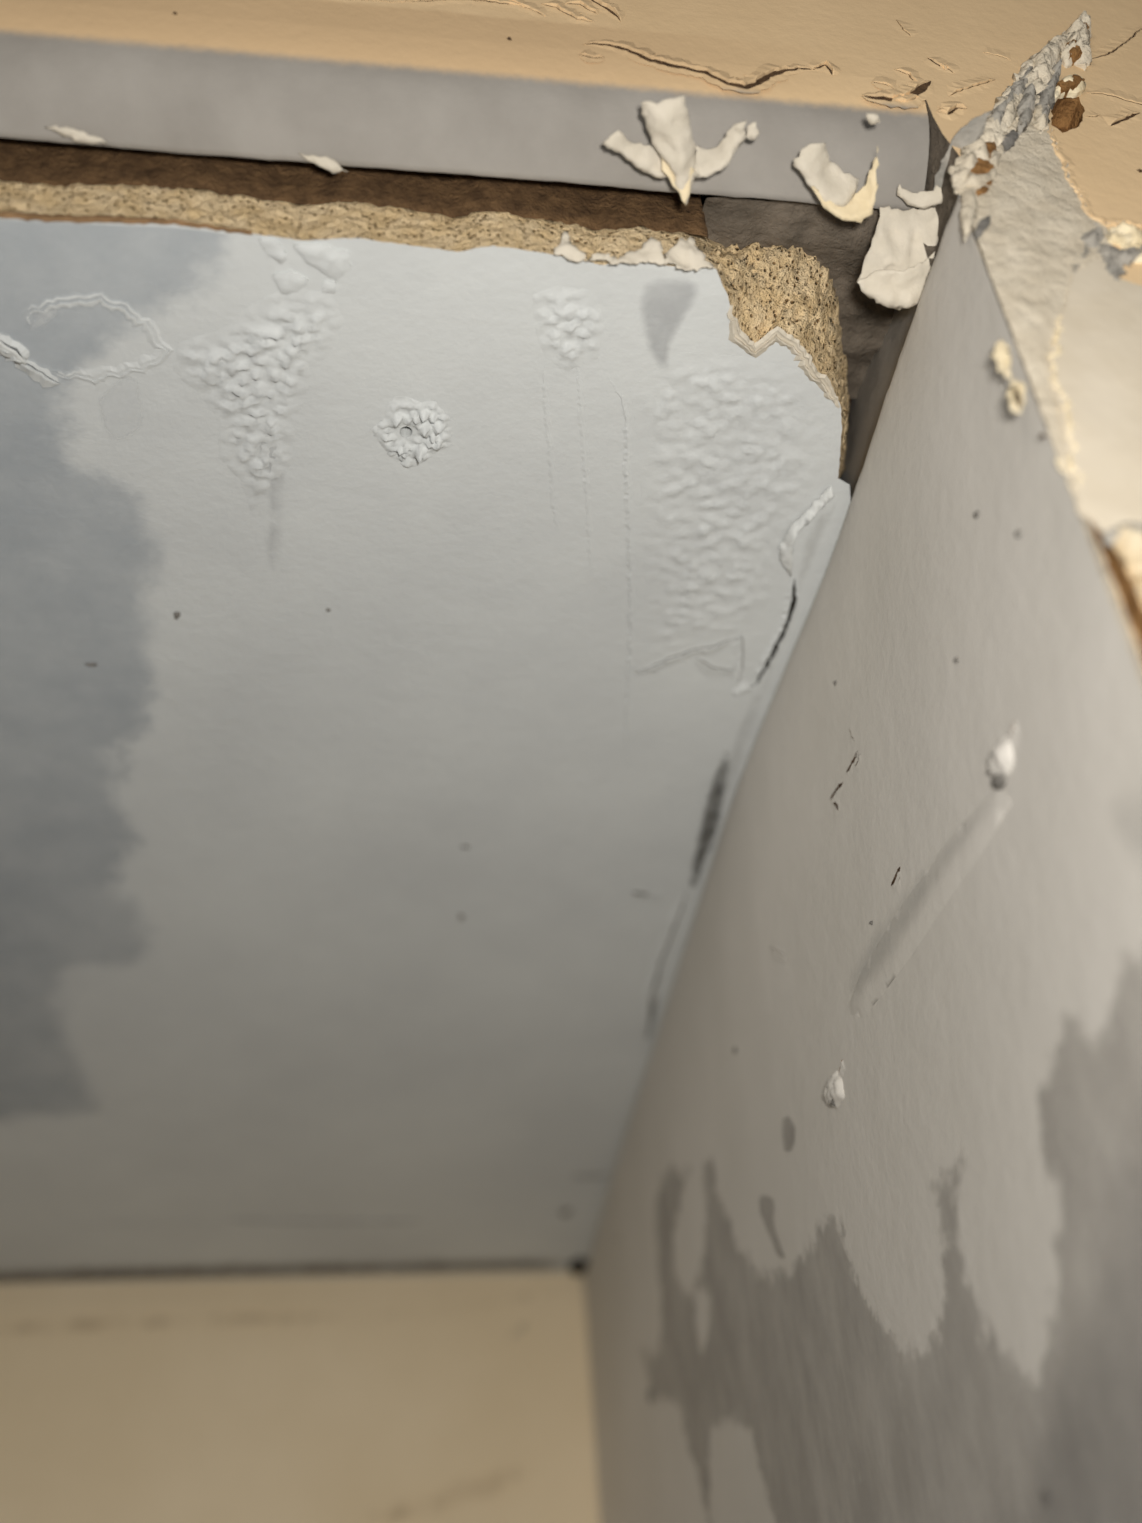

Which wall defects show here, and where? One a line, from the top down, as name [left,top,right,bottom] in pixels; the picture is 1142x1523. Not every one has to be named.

crack [579,20,1011,121]
spalling [1056,22,1089,98]
crack [1084,26,1142,129]
peeling [46,125,107,144]
peeling [298,152,349,174]
peeling [602,95,760,205]
flaking render [960,103,1142,598]
peeling [731,486,834,696]
water stain [692,767,727,883]
spalling [991,774,1007,790]